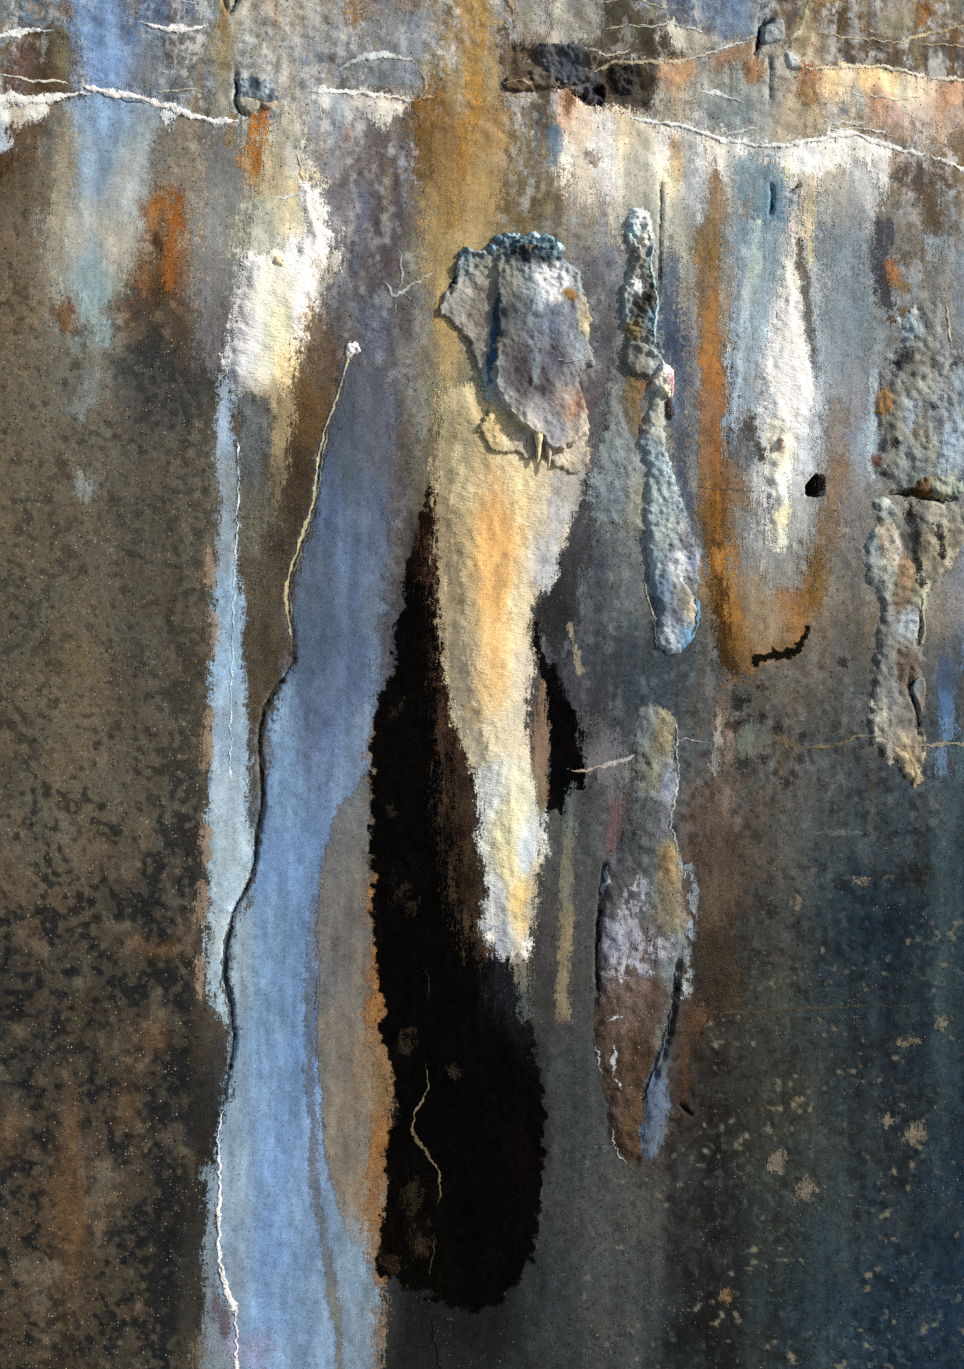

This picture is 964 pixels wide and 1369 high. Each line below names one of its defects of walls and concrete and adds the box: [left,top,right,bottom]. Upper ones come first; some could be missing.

crack [0,27,240,152]
rust [401,0,524,428]
spalling [495,21,663,116]
crack [828,127,892,136]
leakage [0,0,441,1369]
crack [210,355,350,1369]
rust [671,165,855,1117]
crack [802,734,964,780]